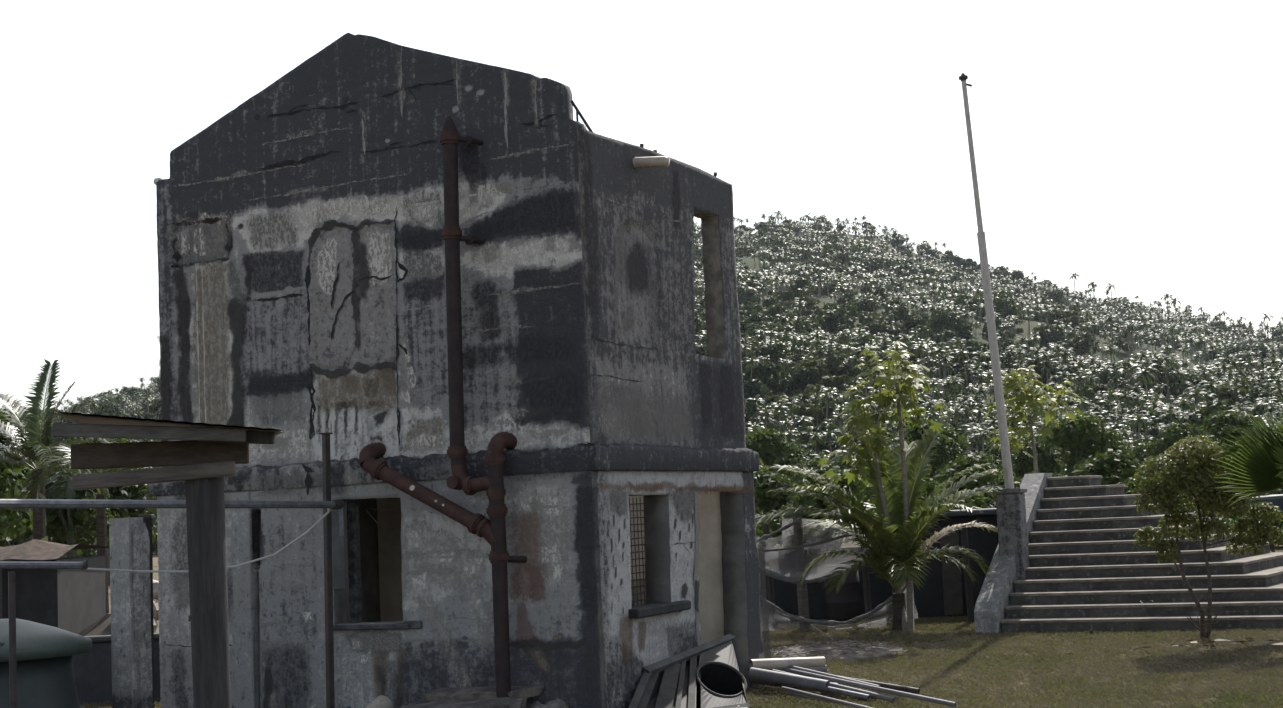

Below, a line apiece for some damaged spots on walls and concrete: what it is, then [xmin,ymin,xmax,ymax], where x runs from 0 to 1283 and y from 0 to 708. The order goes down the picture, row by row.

water stain [243,251,303,301]
crack [302,201,408,495]
water stain [399,228,442,252]
water stain [403,276,444,299]
water stain [463,280,581,419]
water stain [474,124,608,341]